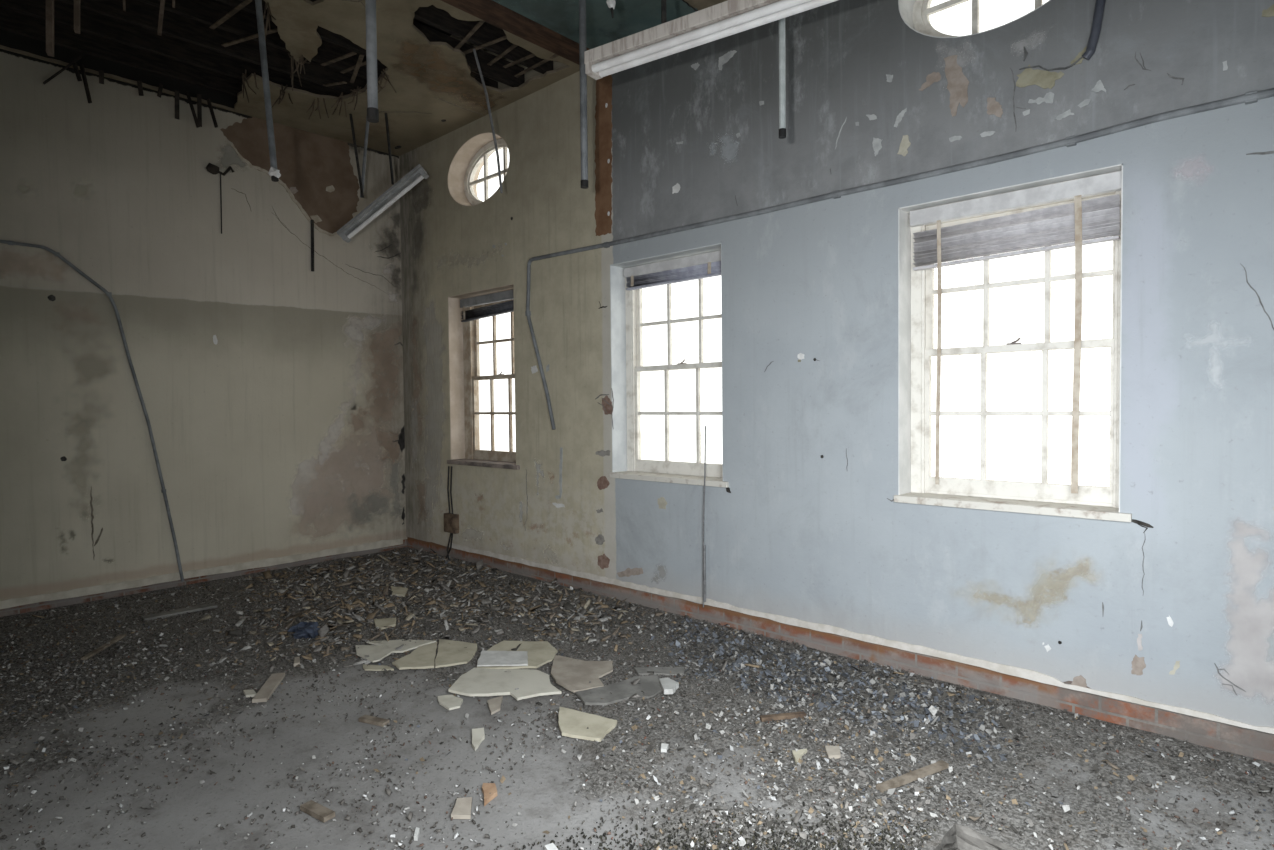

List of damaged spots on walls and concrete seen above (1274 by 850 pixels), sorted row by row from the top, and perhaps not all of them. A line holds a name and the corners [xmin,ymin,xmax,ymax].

peeling [919,55,969,117]
peeling [1016,46,1107,120]
flaking render [220,117,360,236]
peeling [872,137,883,156]
peeling [894,108,911,156]
crack [1246,149,1274,157]
water stain [383,179,430,301]
crack [1240,263,1274,330]
water stain [290,303,444,536]
peeling [1217,521,1274,703]